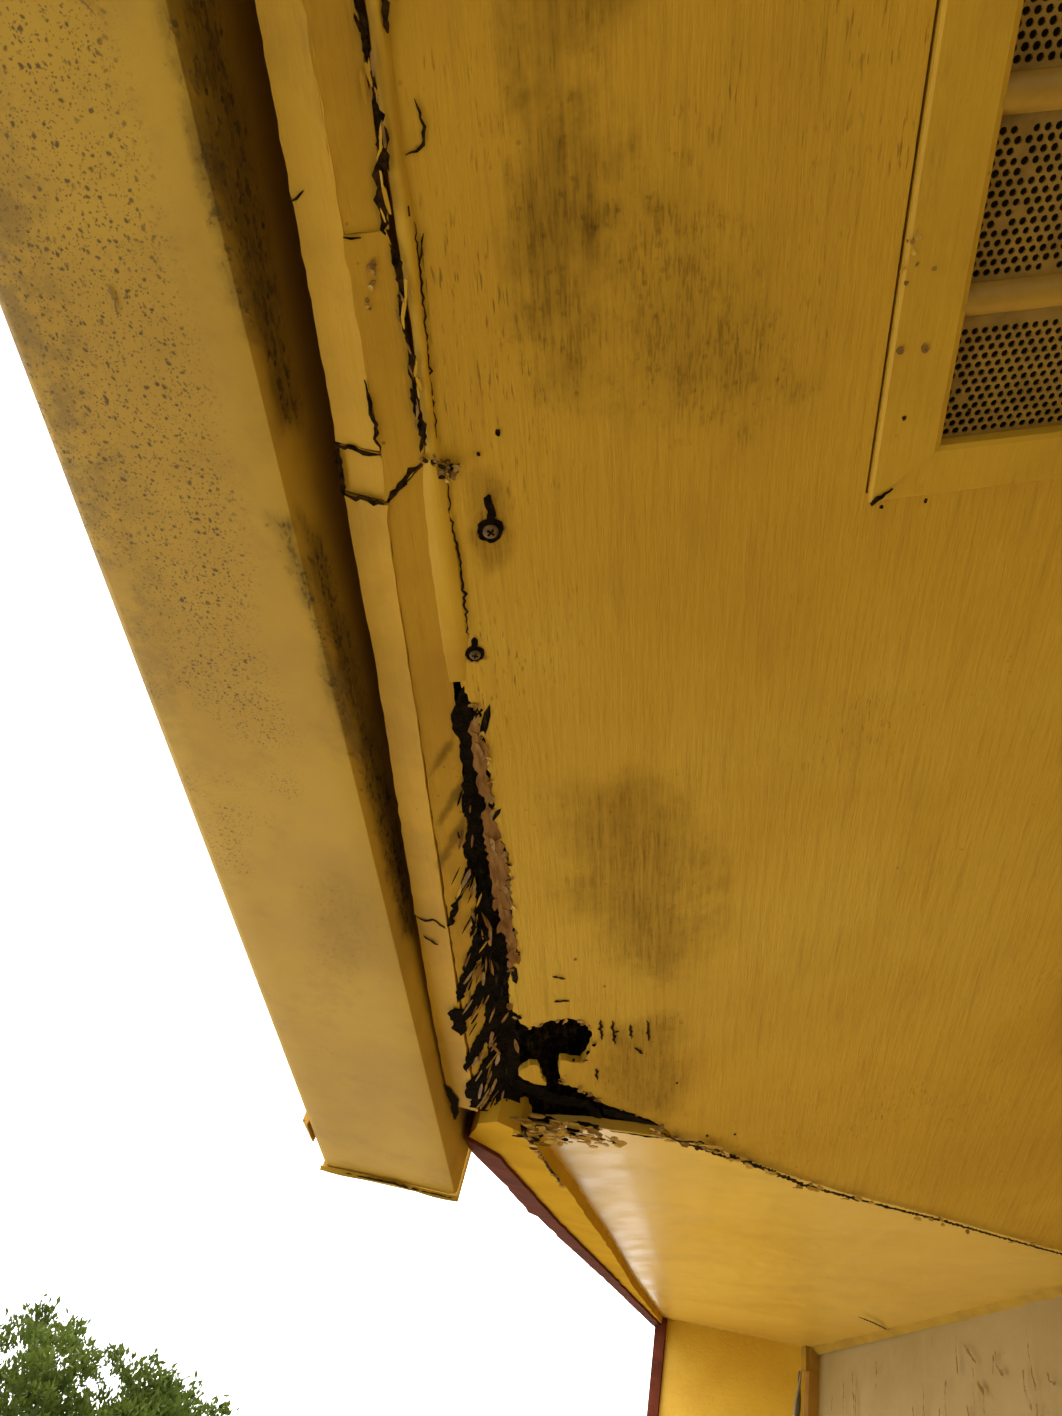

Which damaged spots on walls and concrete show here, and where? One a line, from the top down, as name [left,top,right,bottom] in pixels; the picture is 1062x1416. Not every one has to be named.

crack [334,0,469,634]
peeling [468,711,521,968]